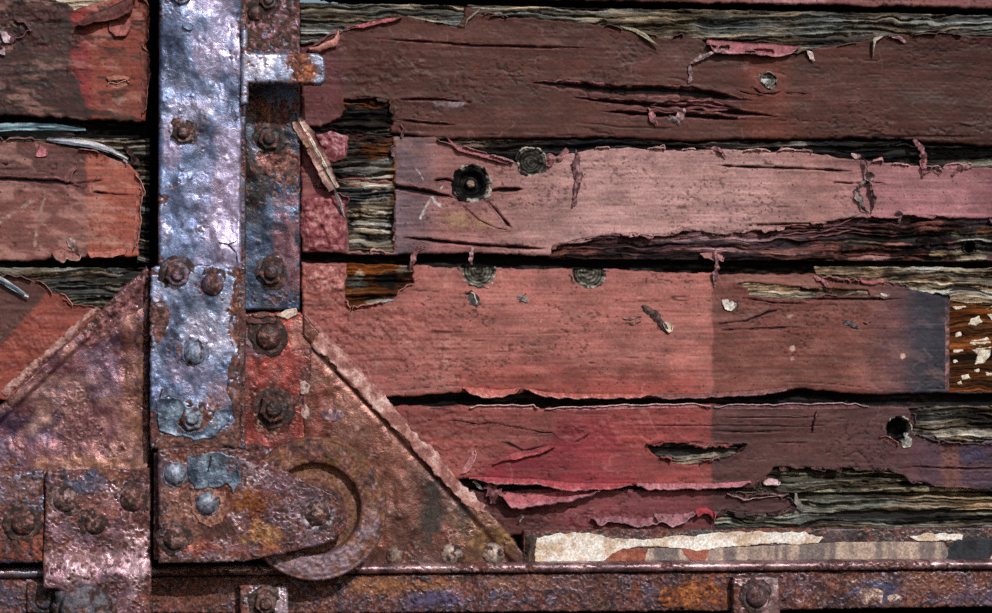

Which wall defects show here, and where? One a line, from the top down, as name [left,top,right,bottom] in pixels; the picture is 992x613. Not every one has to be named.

peeling [56,0,151,113]
corrosion [246,0,314,84]
peeling [300,3,992,83]
crack [528,78,811,122]
peeling [0,122,151,312]
crack [338,177,542,250]
peeling [437,137,992,448]
corrosion [79,276,289,449]
peeling [310,333,992,562]
corrosion [190,487,263,528]
corrosion [466,526,536,562]
corrosion [658,581,719,610]